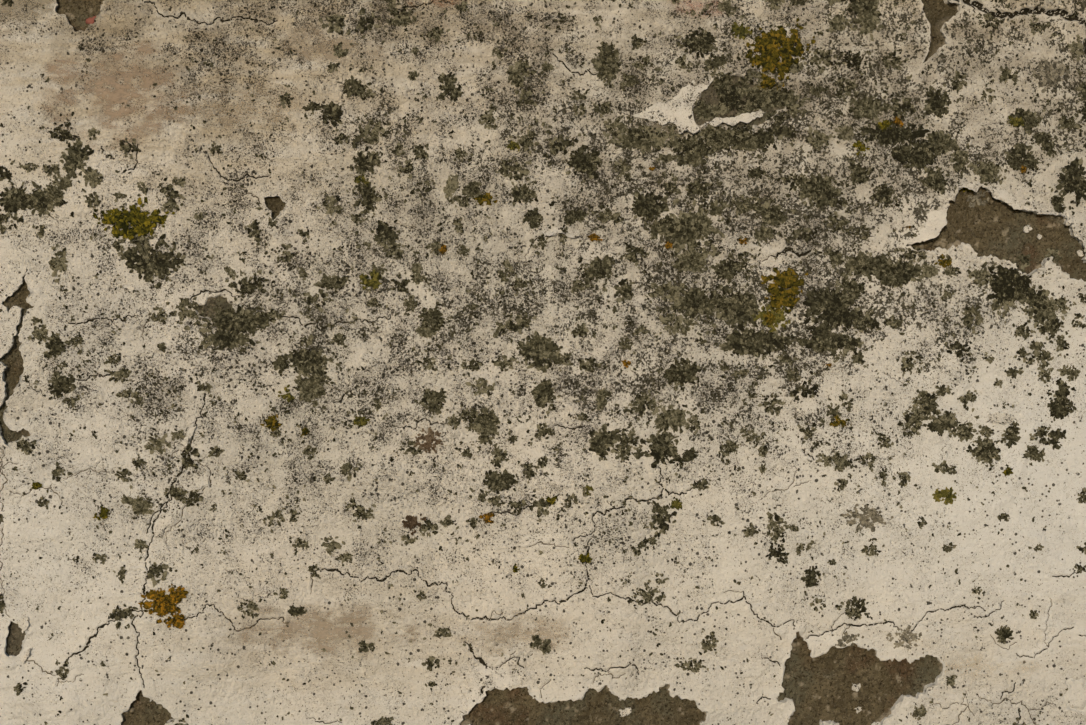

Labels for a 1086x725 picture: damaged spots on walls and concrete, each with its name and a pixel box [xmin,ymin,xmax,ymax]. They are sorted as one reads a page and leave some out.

spalling [53,0,107,35]
crack [955,0,1086,54]
peeling [633,75,785,134]
spalling [903,181,1086,284]
spalling [0,265,36,452]
crack [0,448,109,617]
crack [21,393,212,688]
crack [310,466,1086,725]
spalling [119,687,176,725]
spalling [454,681,710,725]
spalling [771,626,946,725]